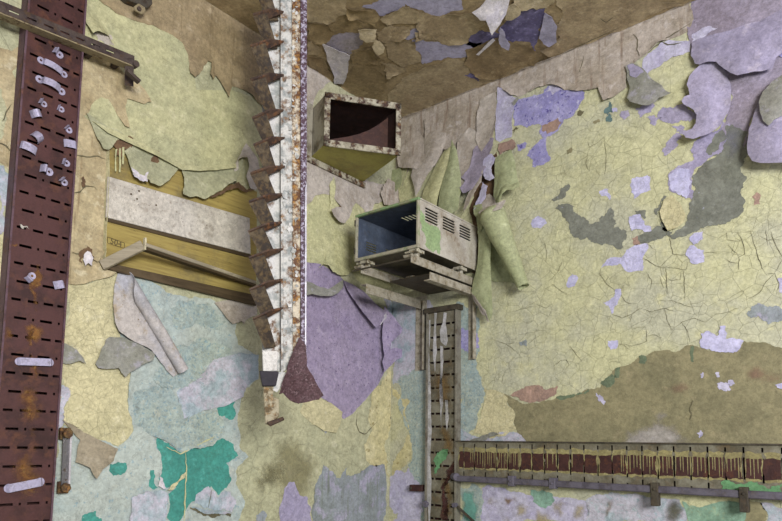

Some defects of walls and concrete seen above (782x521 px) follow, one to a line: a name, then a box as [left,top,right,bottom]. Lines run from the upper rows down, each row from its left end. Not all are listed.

peeling [52,0,262,521]
peeling [279,0,782,521]
crack [600,241,736,348]
crack [706,232,781,297]